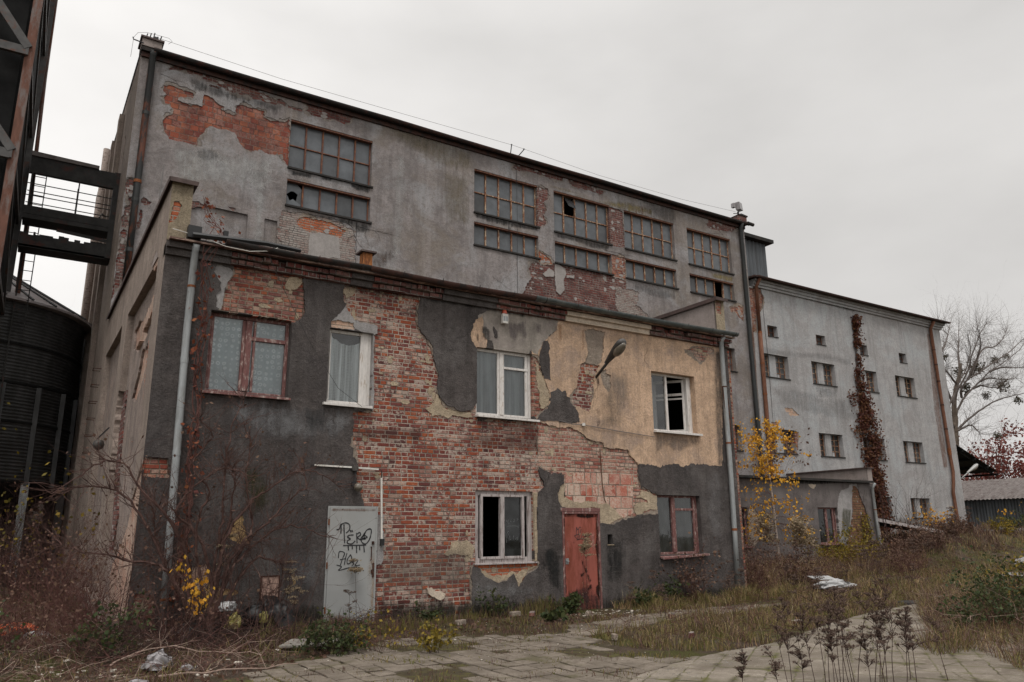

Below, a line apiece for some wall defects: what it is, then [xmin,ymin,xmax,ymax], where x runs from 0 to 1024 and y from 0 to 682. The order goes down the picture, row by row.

flaking render [160,66,353,166]
flaking render [510,163,605,228]
flaking render [214,264,305,323]
flaking render [276,210,356,262]
flaking render [522,207,648,317]
flaking render [331,286,658,623]
flaking render [835,483,871,558]